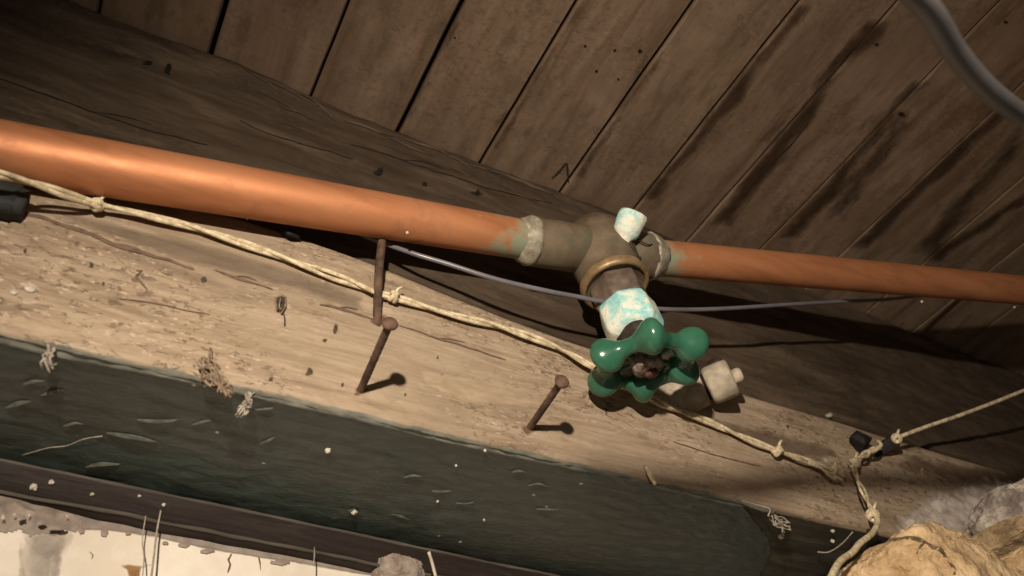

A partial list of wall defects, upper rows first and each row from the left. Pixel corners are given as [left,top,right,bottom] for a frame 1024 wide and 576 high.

leakage [650,76,749,196]
leakage [717,24,883,222]
leakage [783,113,896,236]
leakage [859,113,1001,245]
leakage [923,146,1024,260]